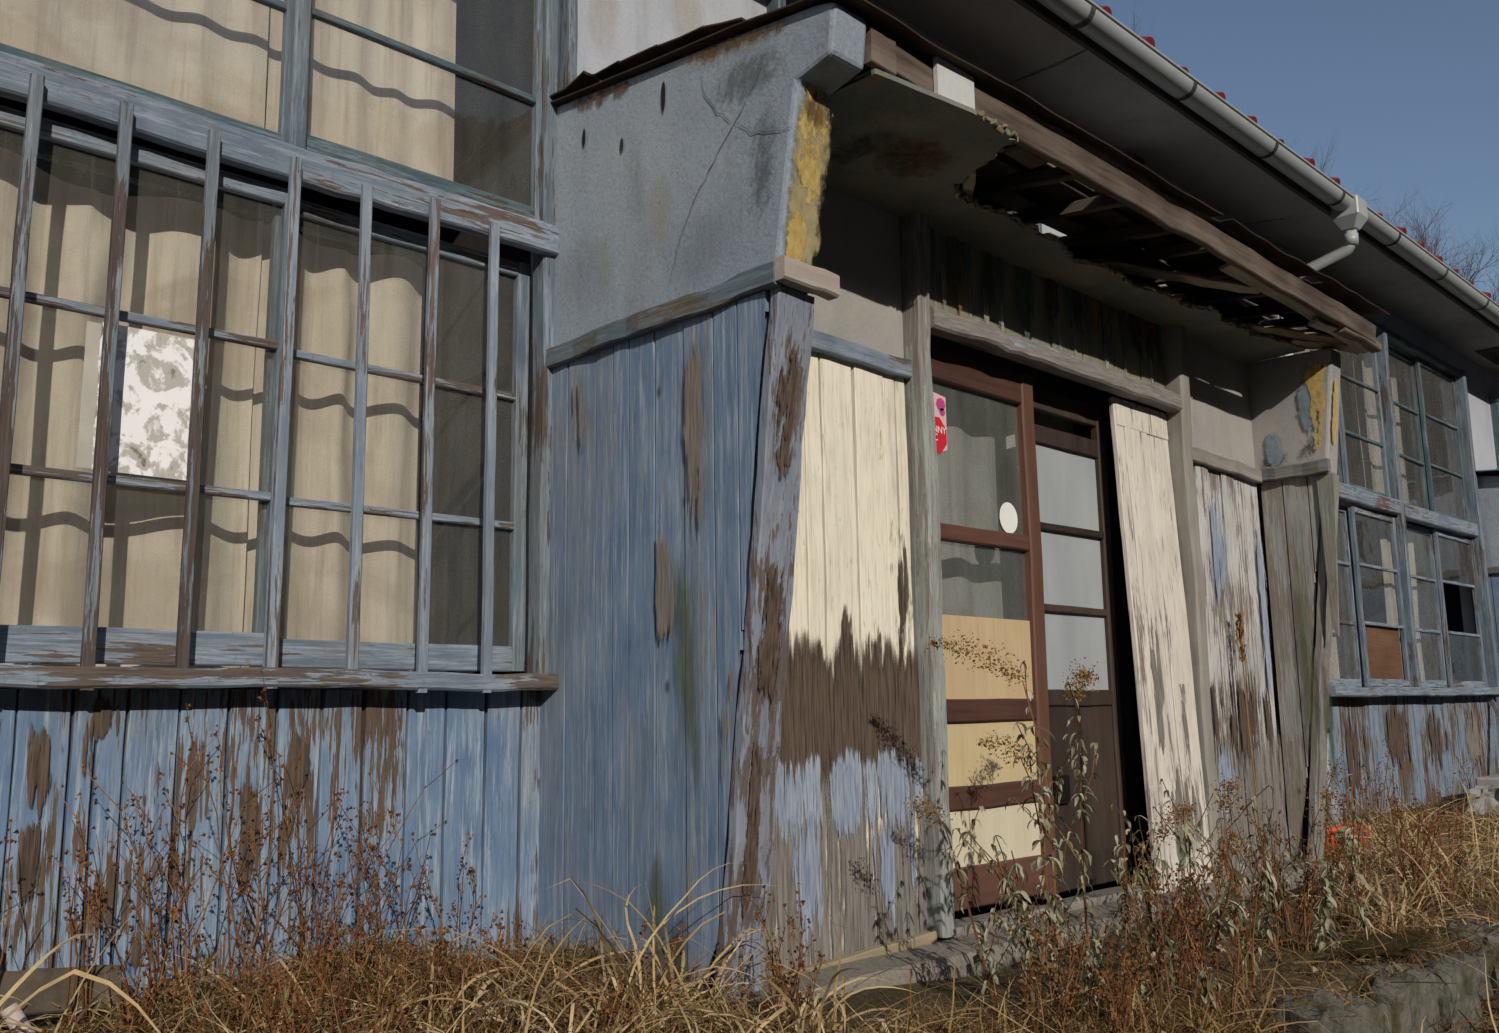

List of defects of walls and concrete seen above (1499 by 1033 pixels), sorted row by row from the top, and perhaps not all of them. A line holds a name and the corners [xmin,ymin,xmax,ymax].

corrosion [688,20,784,61]
crack [670,65,791,278]
peeling [683,333,705,534]
peeling [776,346,799,480]
peeling [655,532,676,641]
peeling [16,722,62,906]
peeling [82,696,120,777]
peeling [237,751,262,894]
peeling [284,731,313,810]
peeling [742,526,927,977]
peeling [1149,519,1290,881]
peeling [1386,705,1492,775]